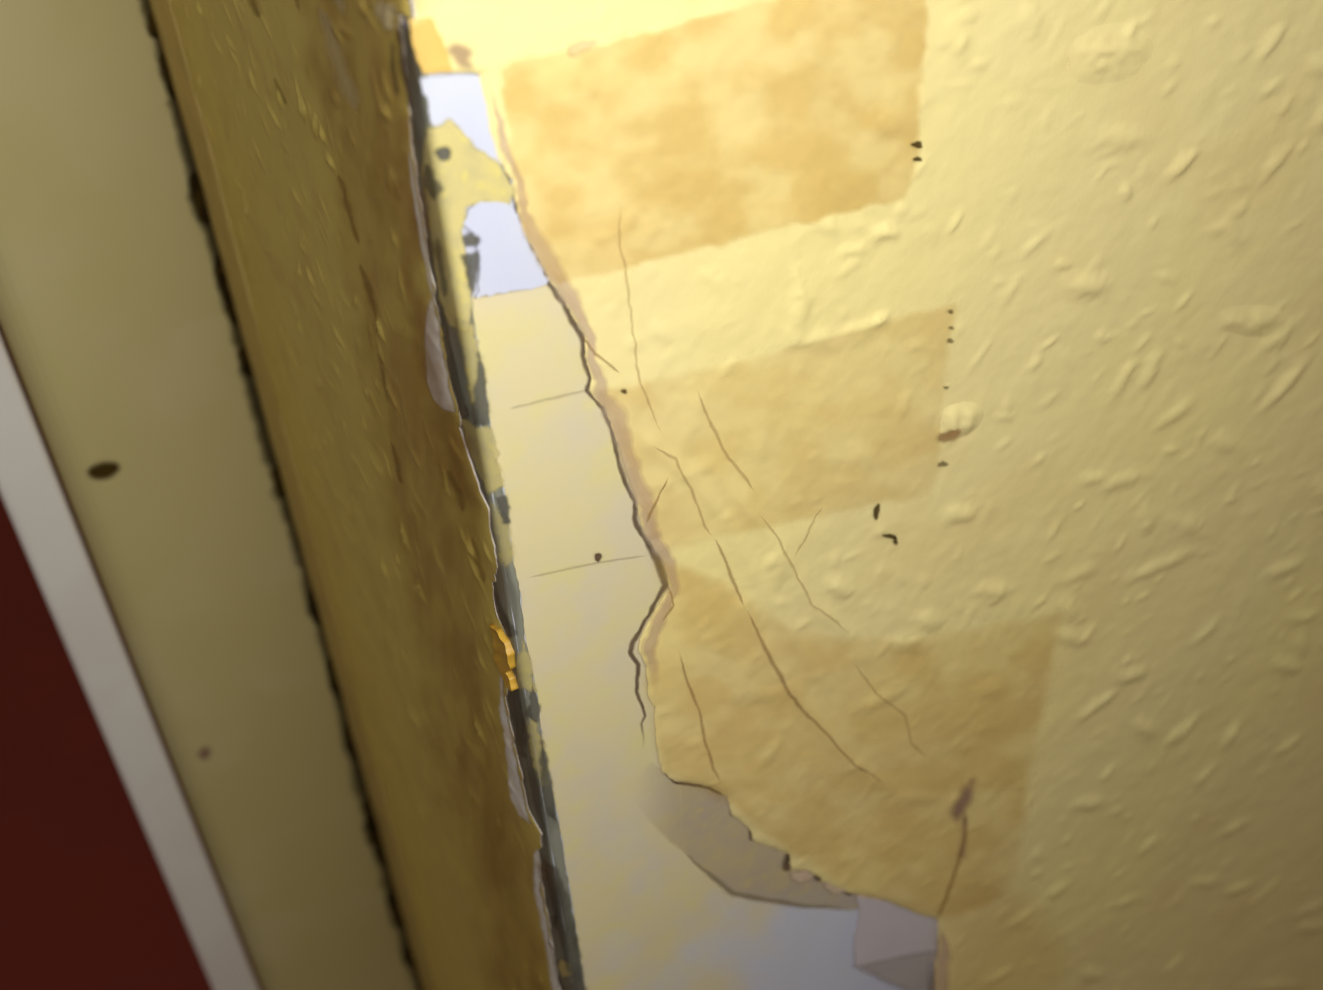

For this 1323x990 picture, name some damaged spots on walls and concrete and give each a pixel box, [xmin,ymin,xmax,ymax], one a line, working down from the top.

flaking render [419,73,502,164]
peeling [425,147,450,198]
flaking render [462,202,549,298]
peeling [437,302,489,425]
peeling [497,496,510,523]
peeling [496,596,516,636]
peeling [509,690,555,819]
crack [939,813,967,916]
peeling [544,862,586,990]
flaking render [801,907,905,990]